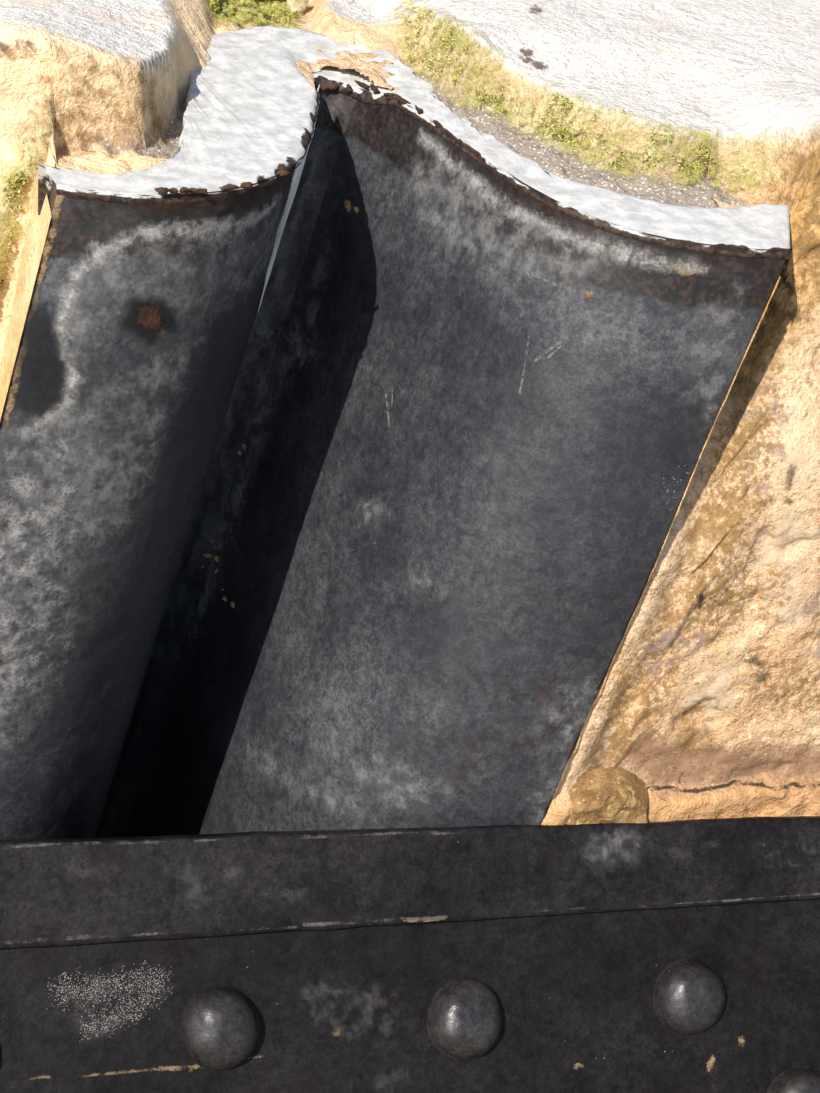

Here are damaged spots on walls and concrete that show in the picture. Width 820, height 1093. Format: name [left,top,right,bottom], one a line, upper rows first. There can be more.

damp [19,85,320,435]
rust [123,299,175,343]
crack [646,773,819,793]